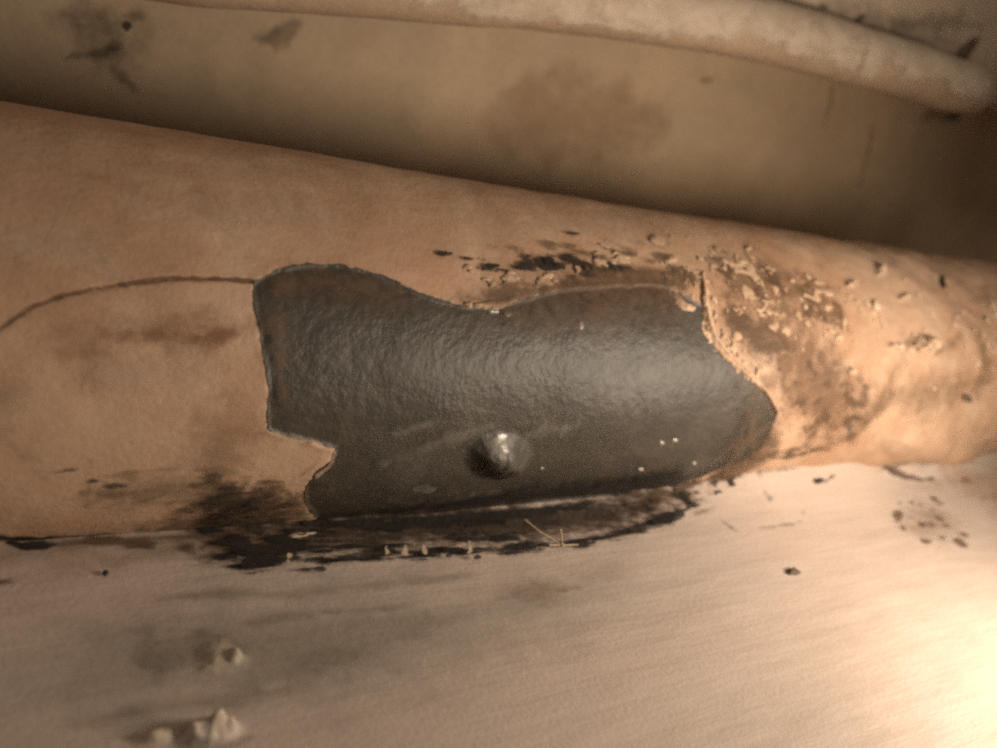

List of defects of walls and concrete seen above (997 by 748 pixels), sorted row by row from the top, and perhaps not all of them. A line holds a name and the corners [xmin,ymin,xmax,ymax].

crack [0,276,255,332]
spalling [253,222,884,520]
water stain [0,460,755,574]